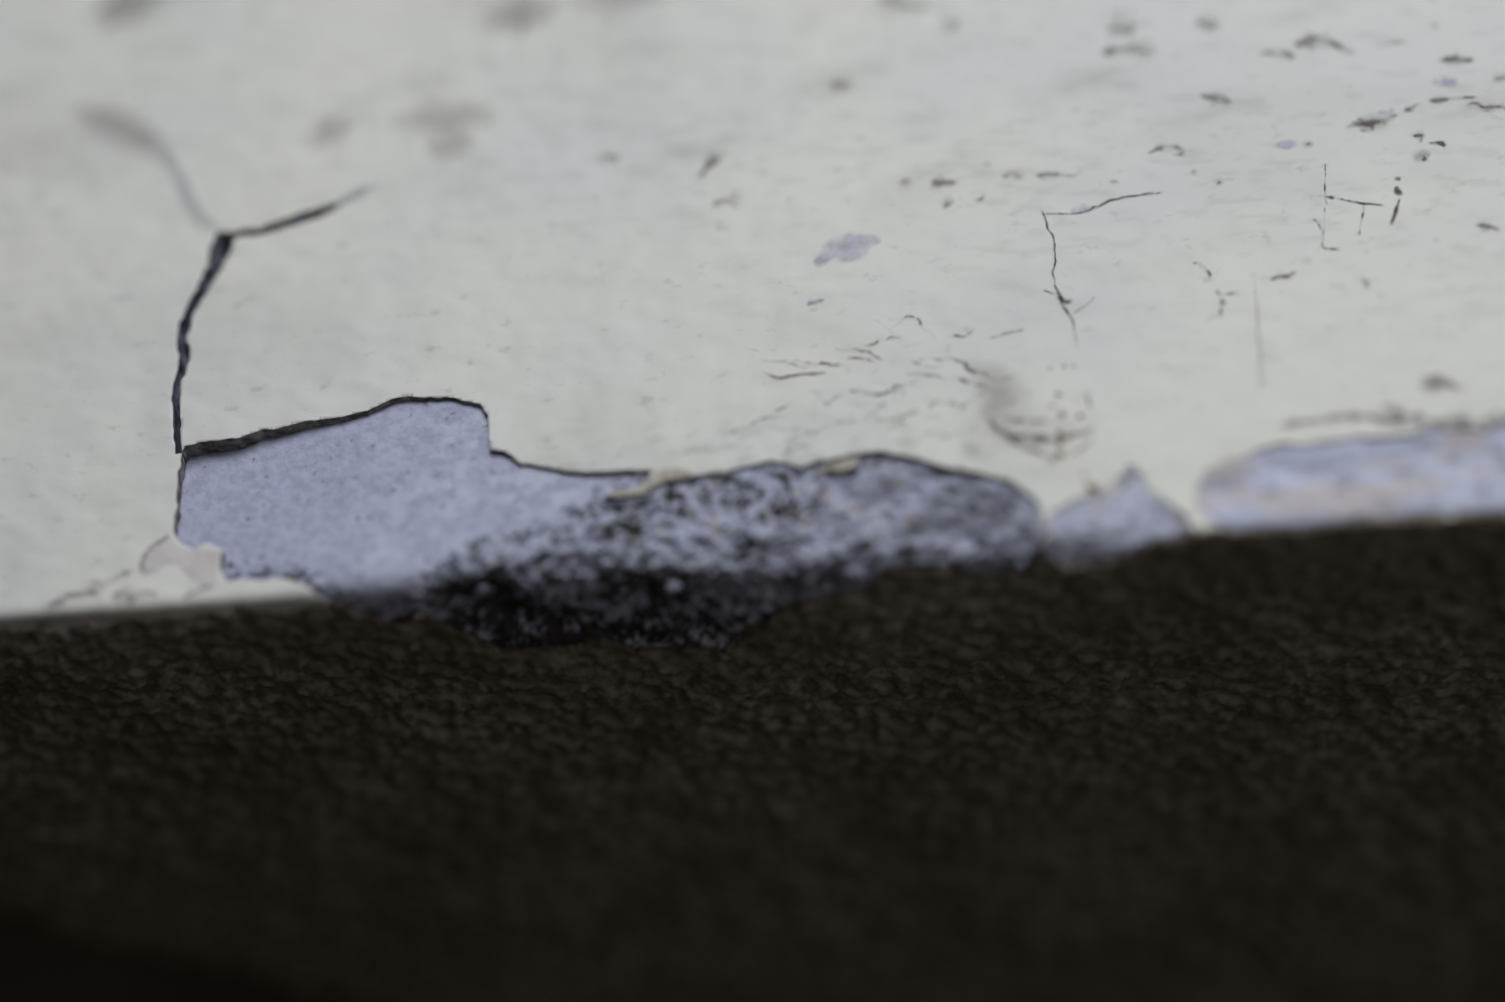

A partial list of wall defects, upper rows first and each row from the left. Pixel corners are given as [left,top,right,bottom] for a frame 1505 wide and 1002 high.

crack [172,191,363,455]
crack [1042,192,1160,342]
spalling [139,400,1505,650]